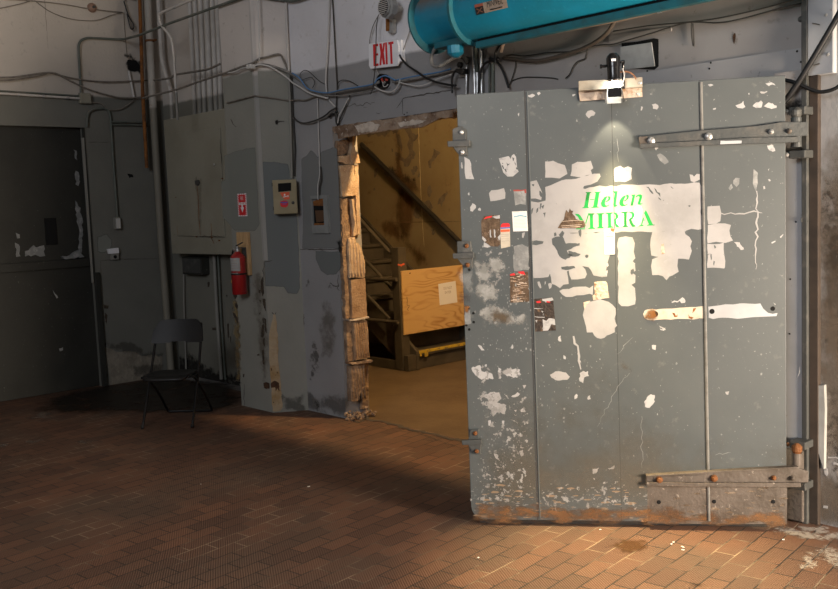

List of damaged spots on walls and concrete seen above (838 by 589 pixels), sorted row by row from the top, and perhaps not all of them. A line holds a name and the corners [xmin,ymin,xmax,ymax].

spalling [332,109,457,167]
peeling [15,233,45,257]
peeling [61,201,84,259]
peeling [478,161,744,339]
spalling [257,277,283,412]
peeling [550,353,589,383]
water stain [822,234,838,442]
peeling [470,360,636,510]
rust [477,505,785,526]